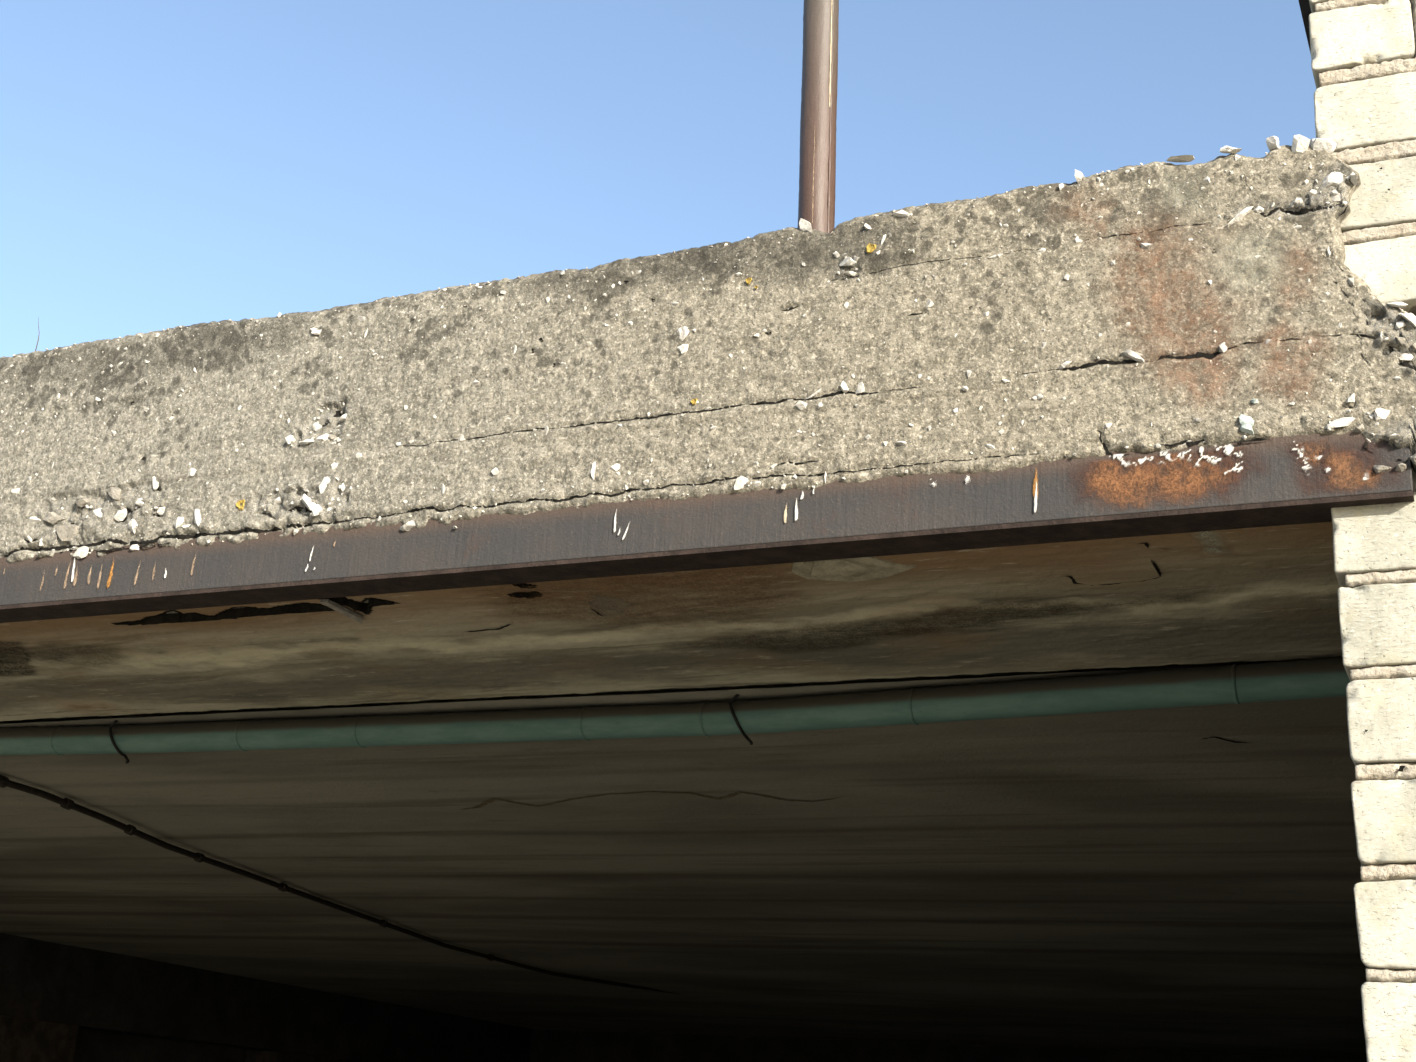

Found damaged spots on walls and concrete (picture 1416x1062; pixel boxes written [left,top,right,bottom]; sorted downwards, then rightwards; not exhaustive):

spalling [1,310,391,461]
spalling [376,276,528,359]
spalling [377,400,555,531]
crack [388,386,925,448]
spalling [546,218,812,363]
spalling [571,366,865,501]
spalling [1123,349,1158,372]
rust [1086,453,1247,498]
crack [1022,314,1380,374]
rust [1300,445,1378,487]
spalling [1280,379,1416,474]
spalling [1370,302,1416,380]